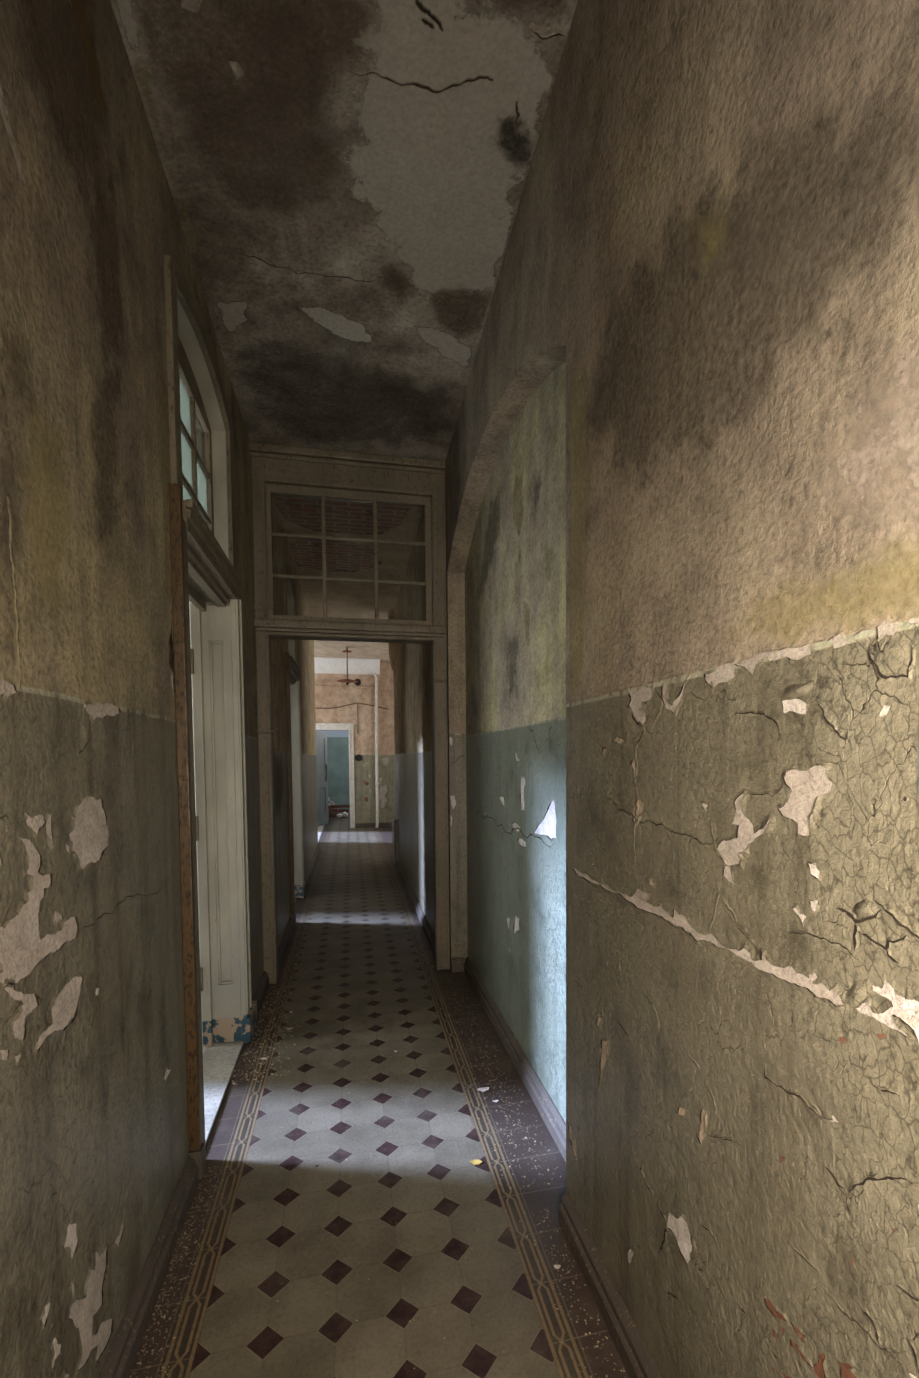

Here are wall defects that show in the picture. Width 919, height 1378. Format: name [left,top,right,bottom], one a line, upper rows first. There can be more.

leakage [142,0,366,208]
crack [354,70,520,129]
flaking render [342,0,553,298]
mould [500,117,531,167]
leakage [604,112,916,466]
leakage [837,335,919,498]
crack [867,623,919,682]
crack [607,674,919,966]
peeling [715,759,832,887]
peeling [0,791,109,1067]
peeling [571,865,919,1047]
crack [825,1164,913,1213]